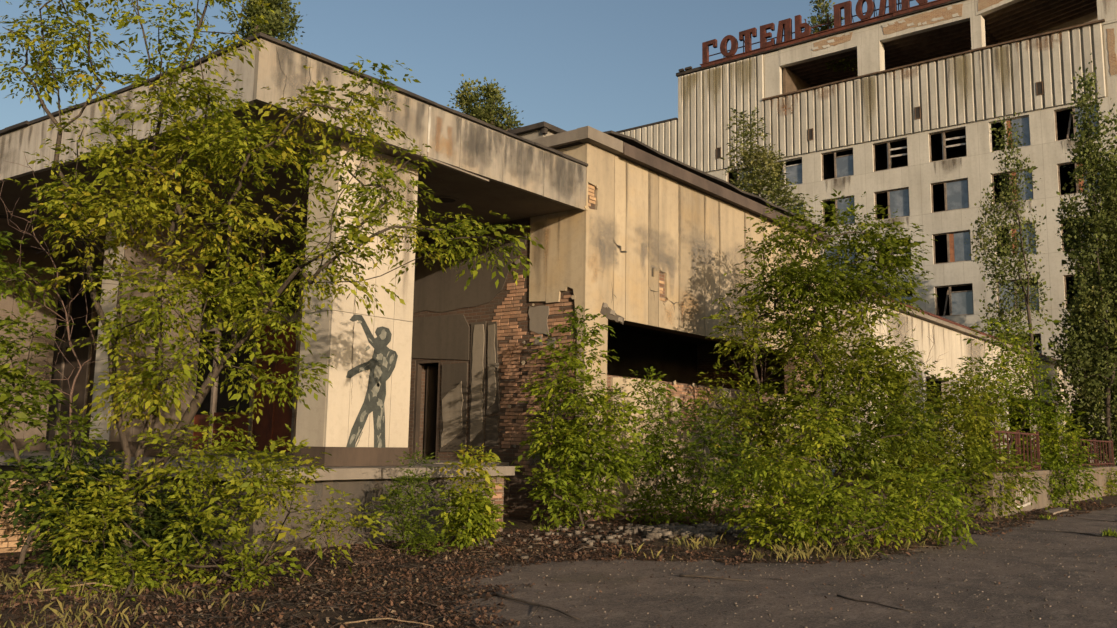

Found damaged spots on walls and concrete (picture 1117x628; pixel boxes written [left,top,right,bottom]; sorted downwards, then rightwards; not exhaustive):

spalling [492,259,580,500]